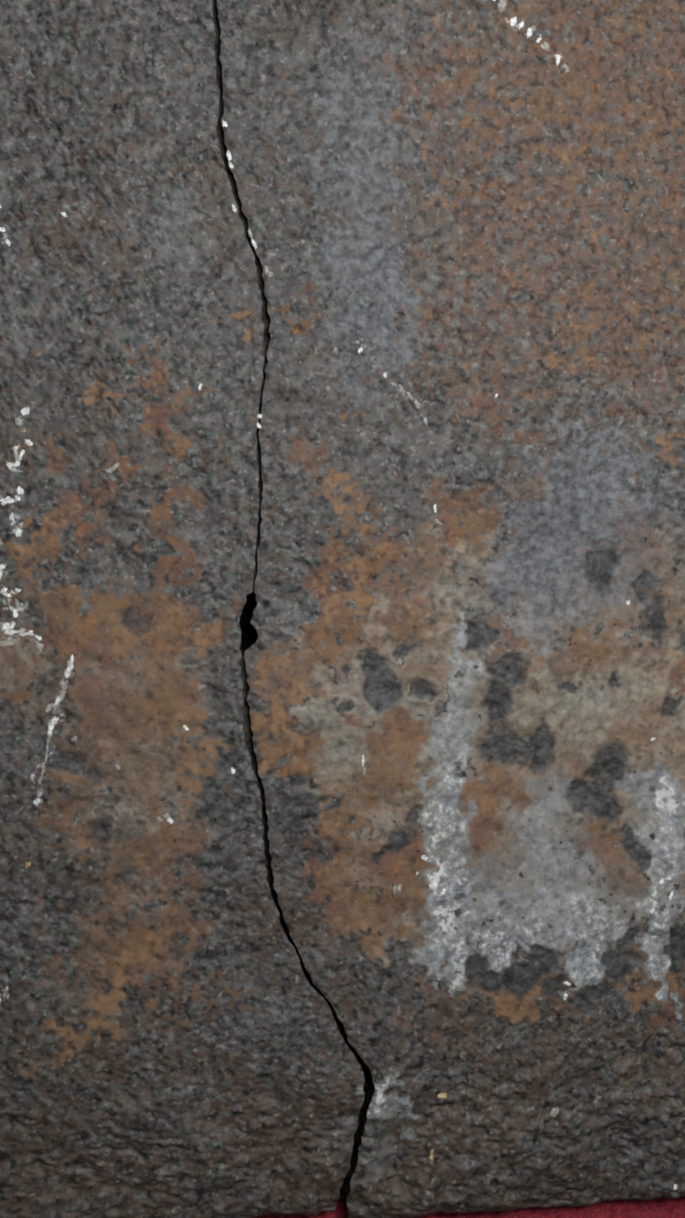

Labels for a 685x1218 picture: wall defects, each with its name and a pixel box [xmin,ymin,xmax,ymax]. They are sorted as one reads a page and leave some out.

damp [109,168,227,311]
damp [275,0,447,432]
rust [247,0,685,778]
rust [0,351,266,1102]
crack [212,0,375,1218]
rust [298,706,600,1090]
damp [256,405,685,1021]
rust [562,817,650,905]
rust [616,942,685,1058]